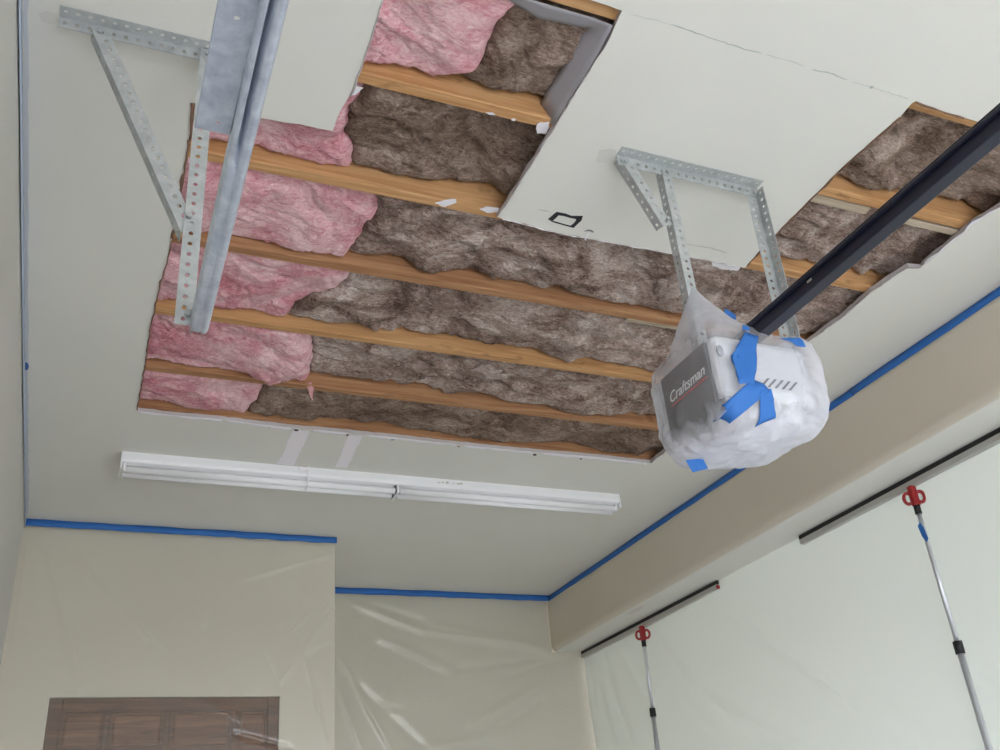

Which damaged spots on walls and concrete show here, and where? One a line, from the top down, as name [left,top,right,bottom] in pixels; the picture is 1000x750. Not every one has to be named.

crack [631,14,910,100]